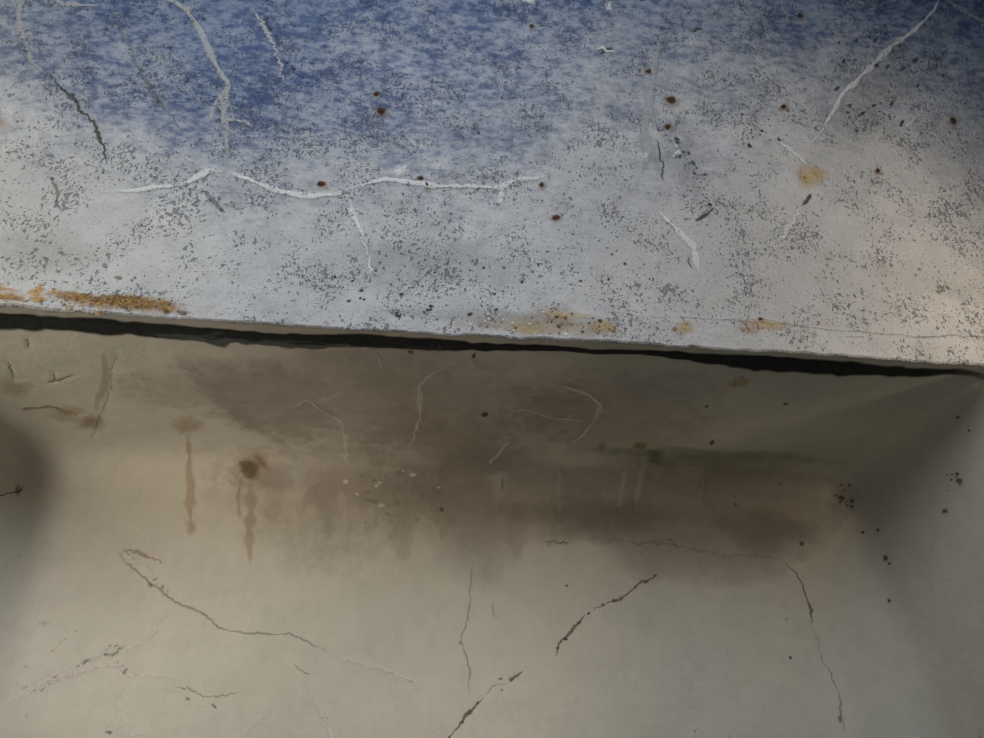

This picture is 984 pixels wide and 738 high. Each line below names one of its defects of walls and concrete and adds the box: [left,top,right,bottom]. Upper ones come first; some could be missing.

crack [15,0,107,161]
crack [780,2,984,164]
crack [109,0,544,275]
crack [776,194,812,242]
rust [0,283,186,315]
rust [242,461,257,478]
crack [556,574,658,656]
crack [787,565,812,618]
crack [448,671,523,738]